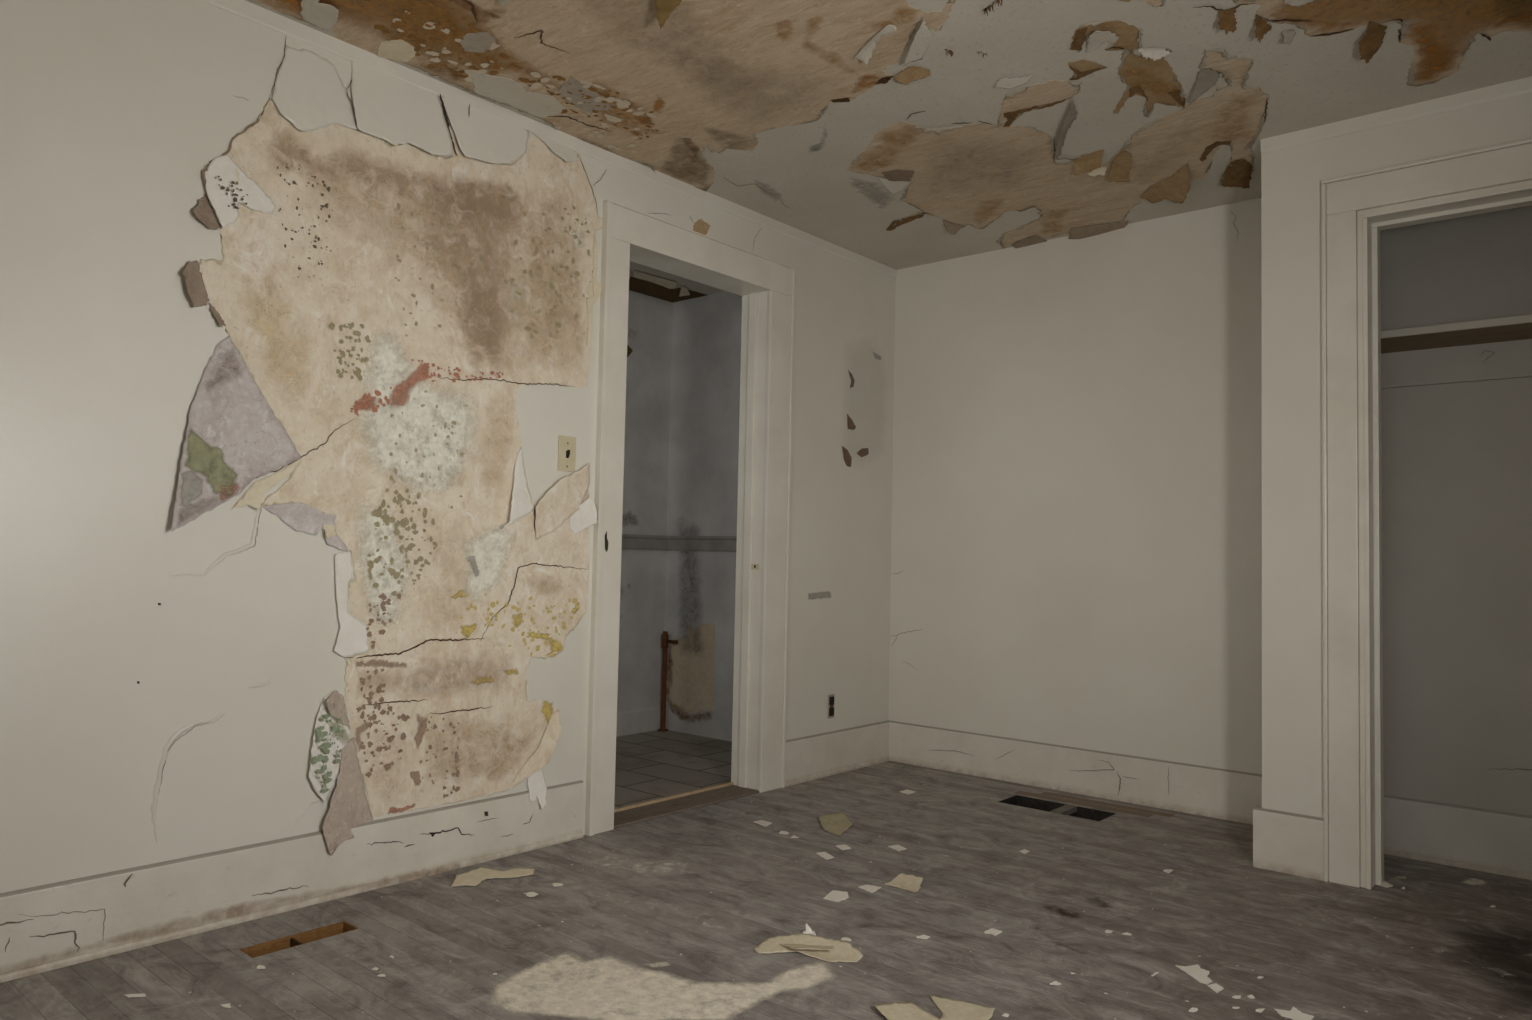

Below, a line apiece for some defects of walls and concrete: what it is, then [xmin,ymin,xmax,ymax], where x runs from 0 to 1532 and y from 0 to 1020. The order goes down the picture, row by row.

peeling [300,0,339,31]
peeling [376,39,416,62]
peeling [460,32,496,53]
peeling [473,72,611,119]
crack [440,94,470,155]
peeling [877,177,915,195]
damp [277,149,340,278]
peeling [690,214,710,235]
peeling [842,446,869,467]
crack [169,418,356,577]
damp [312,160,593,813]